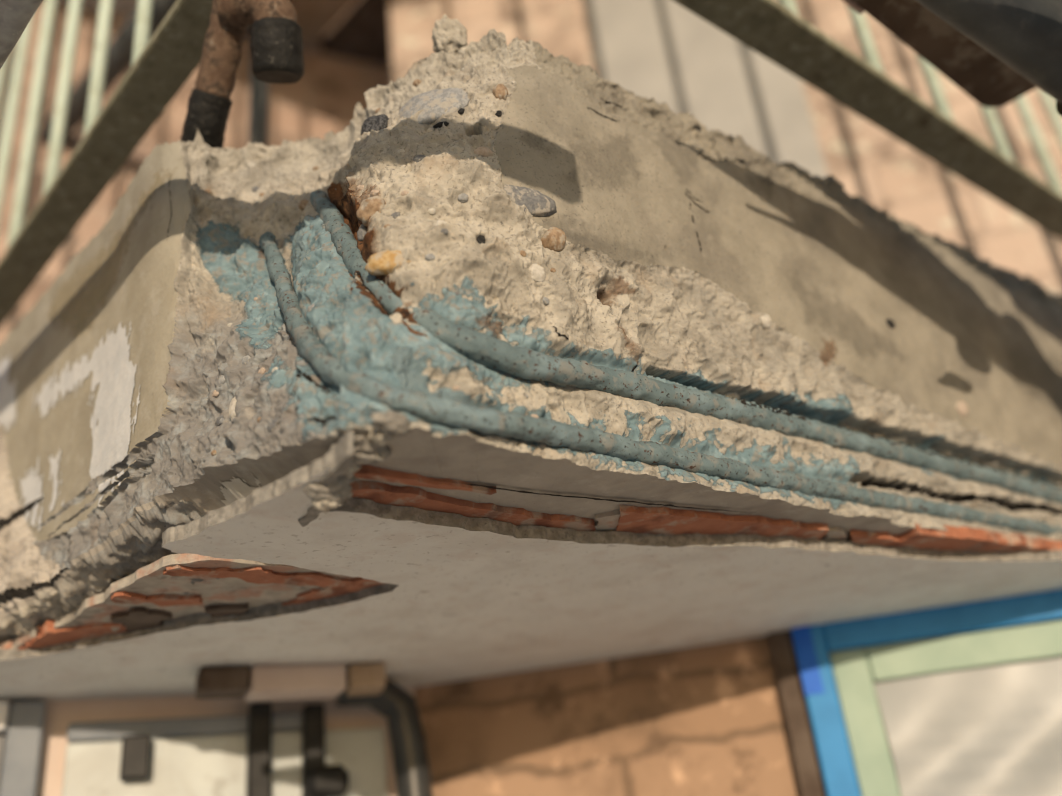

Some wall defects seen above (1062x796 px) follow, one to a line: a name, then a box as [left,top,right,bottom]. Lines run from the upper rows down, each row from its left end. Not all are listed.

rust [327,183,374,263]
rust [349,273,388,316]
rust [375,275,404,298]
peeling [0,129,1062,702]
crack [732,398,1062,515]
crack [0,496,43,530]
crack [0,567,70,604]